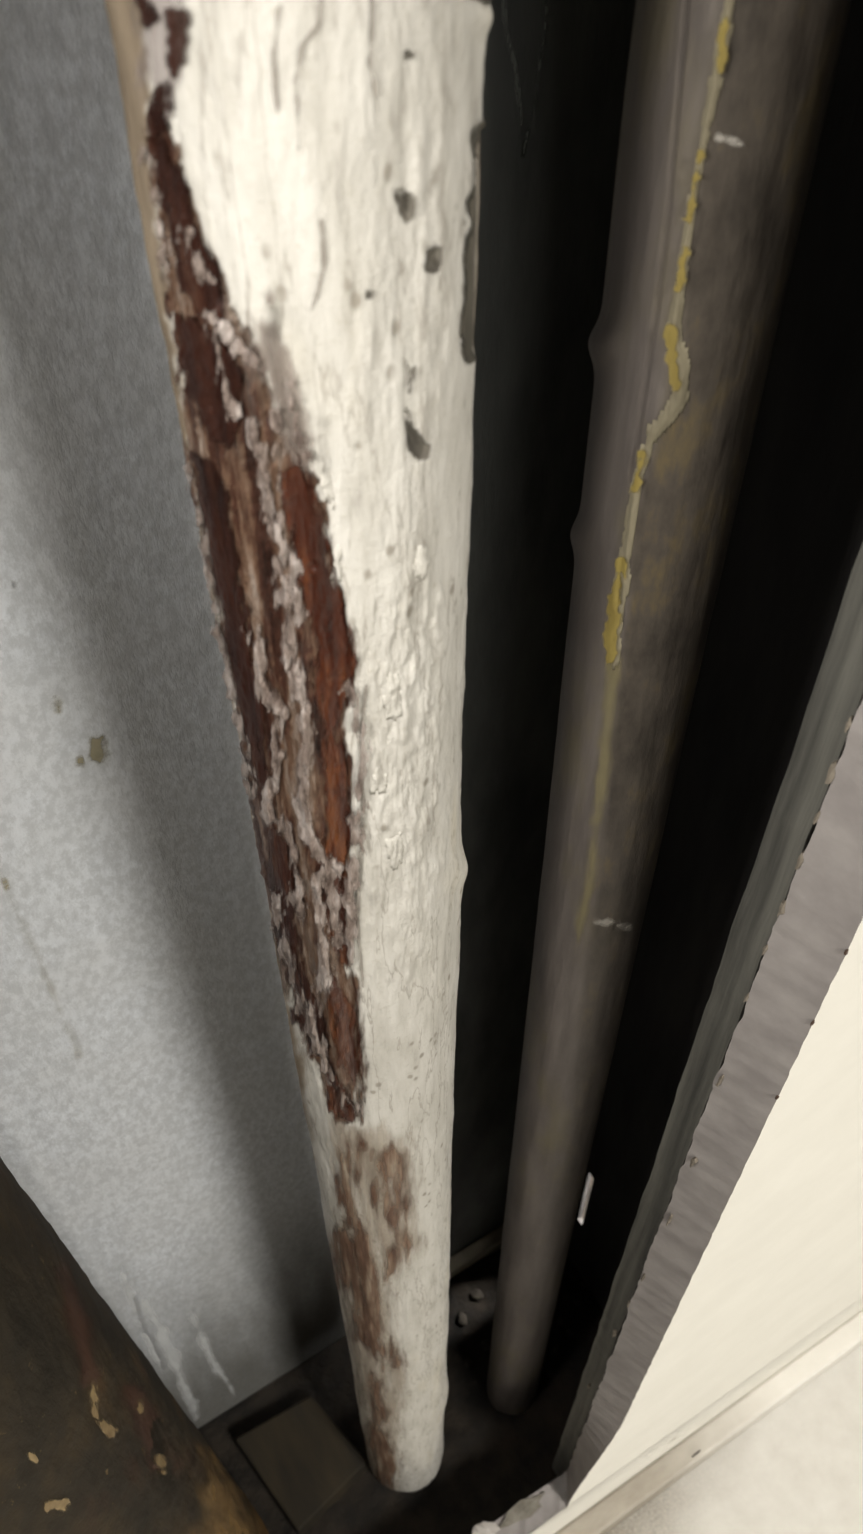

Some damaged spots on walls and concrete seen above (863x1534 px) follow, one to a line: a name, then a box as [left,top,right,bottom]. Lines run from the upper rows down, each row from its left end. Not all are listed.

peeling [395,192,415,223]
peeling [425,246,443,274]
peeling [460,120,486,364]
peeling [405,367,431,460]
rust [134,0,412,1490]
peeling [90,1384,118,1438]
peeling [156,1454,166,1475]
peeling [44,1498,70,1513]